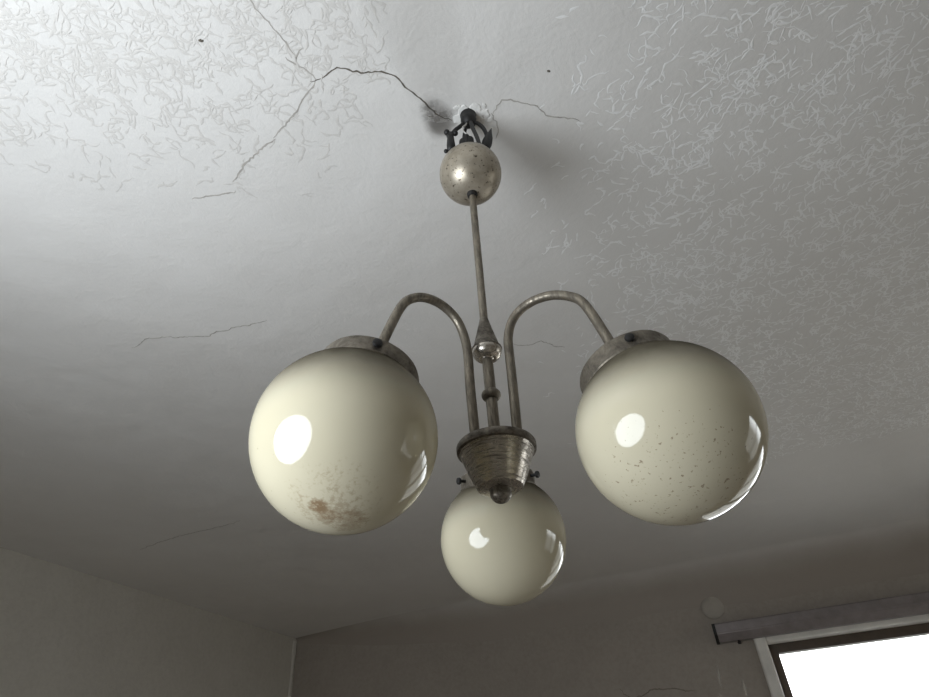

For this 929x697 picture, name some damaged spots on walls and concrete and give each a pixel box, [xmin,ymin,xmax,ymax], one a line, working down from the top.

crack [193,0,451,199]
crack [489,99,579,138]
crack [132,321,264,348]